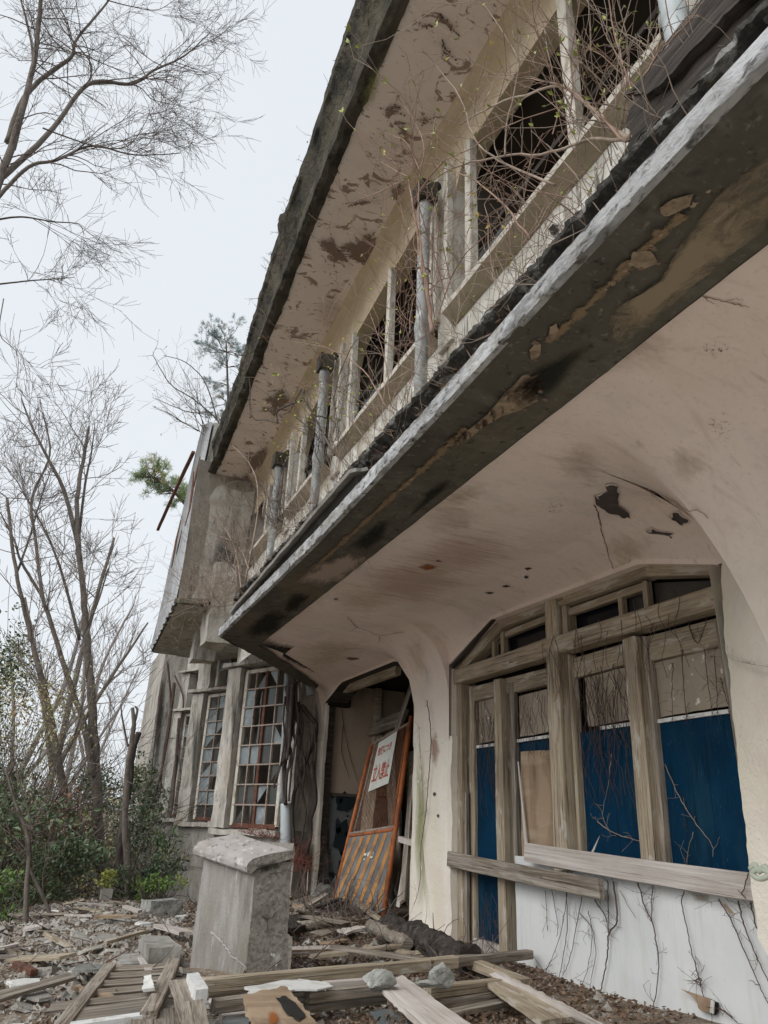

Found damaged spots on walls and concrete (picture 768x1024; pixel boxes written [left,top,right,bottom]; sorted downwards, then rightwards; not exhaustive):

spalling [660,194,693,216]
spalling [629,245,661,271]
spalling [454,324,559,452]
corrosion [313,428,468,570]
crack [593,505,614,569]
peeling [593,483,630,519]
crack [578,459,708,519]
peeling [645,510,690,538]